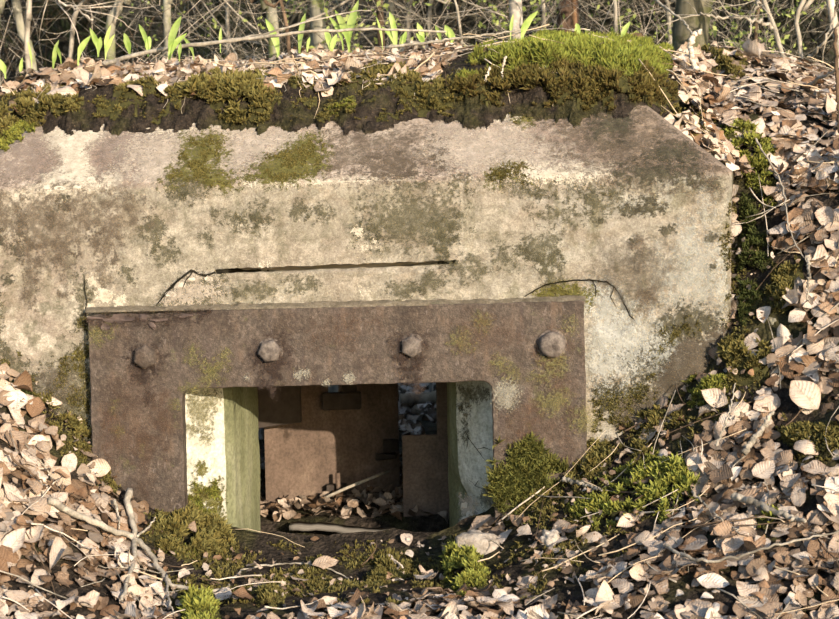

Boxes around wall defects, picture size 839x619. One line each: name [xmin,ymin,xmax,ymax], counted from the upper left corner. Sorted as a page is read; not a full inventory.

crack [154,268,269,307]
crack [525,279,634,319]
rust [123,338,171,407]
rust [245,332,294,398]
rust [387,331,429,394]